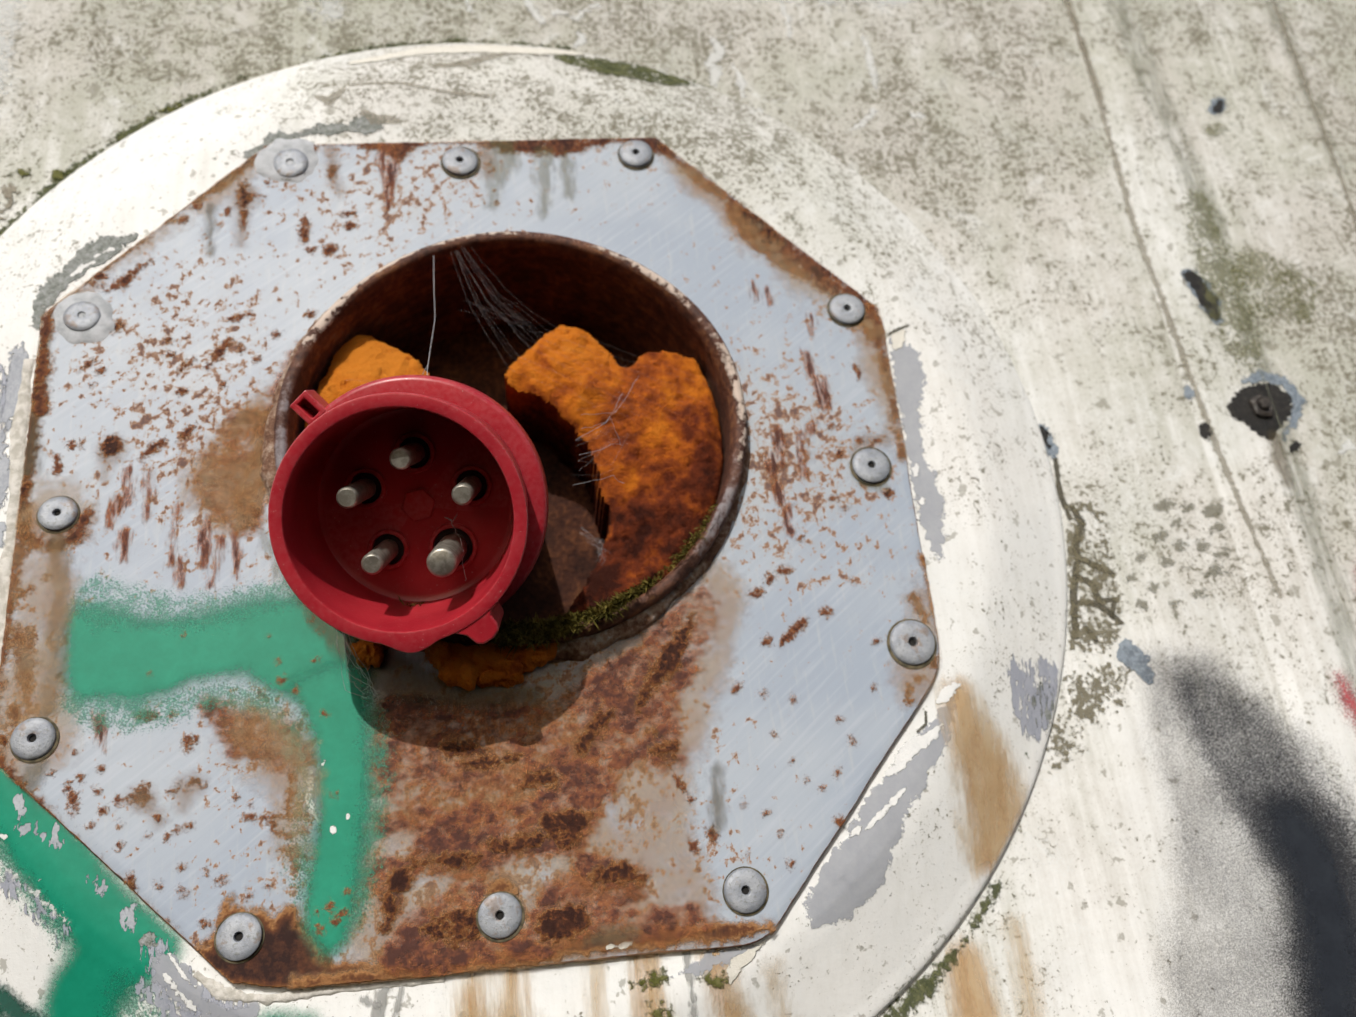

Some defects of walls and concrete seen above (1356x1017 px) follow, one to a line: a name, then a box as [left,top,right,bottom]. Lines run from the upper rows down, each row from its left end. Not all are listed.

peeling [31,233,138,330]
rust [340,137,907,460]
peeling [0,341,29,548]
rust [0,146,269,813]
rust [762,351,835,542]
rust [761,606,833,646]
peeling [1007,654,1059,743]
peeling [0,793,65,849]
peeling [0,862,72,945]
rust [46,765,192,851]
rust [194,587,776,1017]
peeling [802,681,961,929]